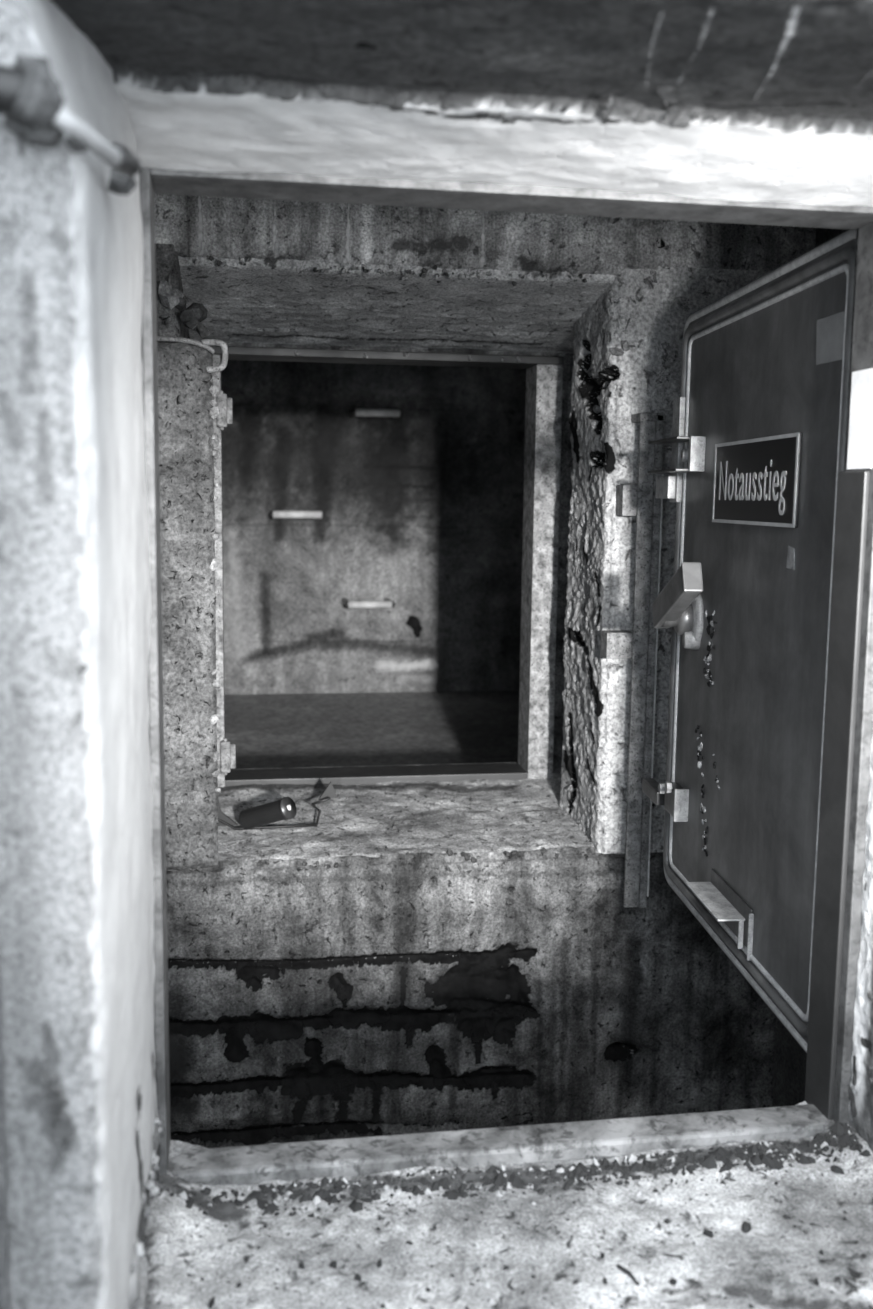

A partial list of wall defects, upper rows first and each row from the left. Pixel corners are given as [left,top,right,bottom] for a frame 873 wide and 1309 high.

spalling [568,339,629,473]
flaking render [568,603,604,717]
flaking render [563,712,578,814]
water stain [168,996,459,1137]